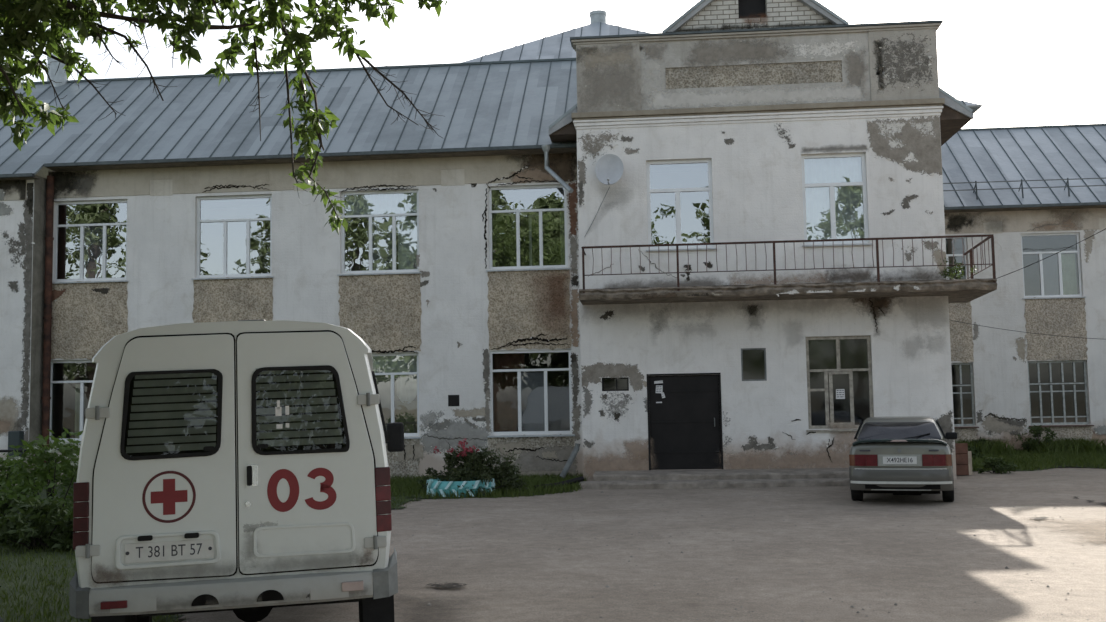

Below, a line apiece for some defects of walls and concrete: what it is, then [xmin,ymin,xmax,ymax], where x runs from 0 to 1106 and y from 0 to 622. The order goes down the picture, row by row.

peeling [872,33,933,91]
flaking render [866,116,942,216]
crack [202,184,269,193]
crack [482,165,557,269]
flaking render [681,261,713,281]
peeling [0,183,35,442]
peeling [397,131,650,479]
leakage [854,297,894,315]
crack [491,333,570,350]
leakage [0,397,19,433]
flaking render [723,411,793,455]
flaking render [976,410,1032,437]